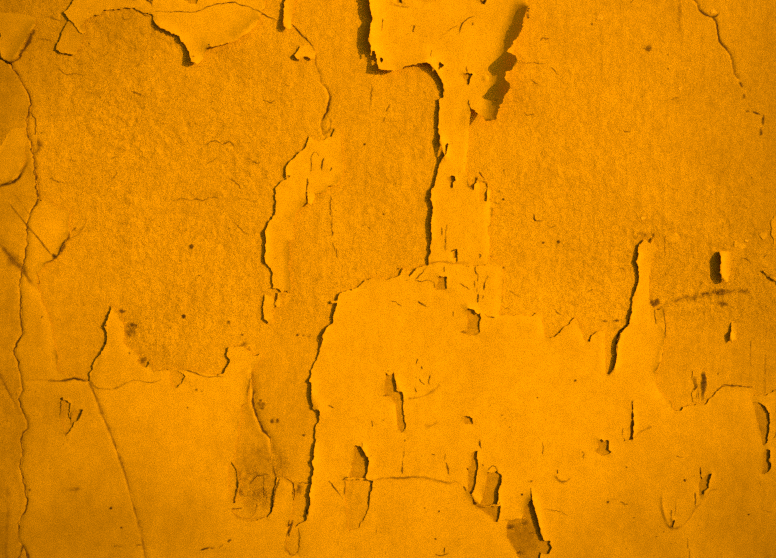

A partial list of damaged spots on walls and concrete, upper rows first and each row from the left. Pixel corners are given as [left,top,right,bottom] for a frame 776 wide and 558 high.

peeling [55,0,265,64]
crack [697,2,732,59]
peeling [368,0,530,267]
crack [49,237,69,262]
peeling [263,128,343,323]
peeling [719,241,747,282]
crack [0,32,58,558]
spalling [384,372,406,432]
spalling [232,339,323,526]
spalling [344,477,373,531]
spalling [480,471,502,507]
spalling [506,500,552,558]